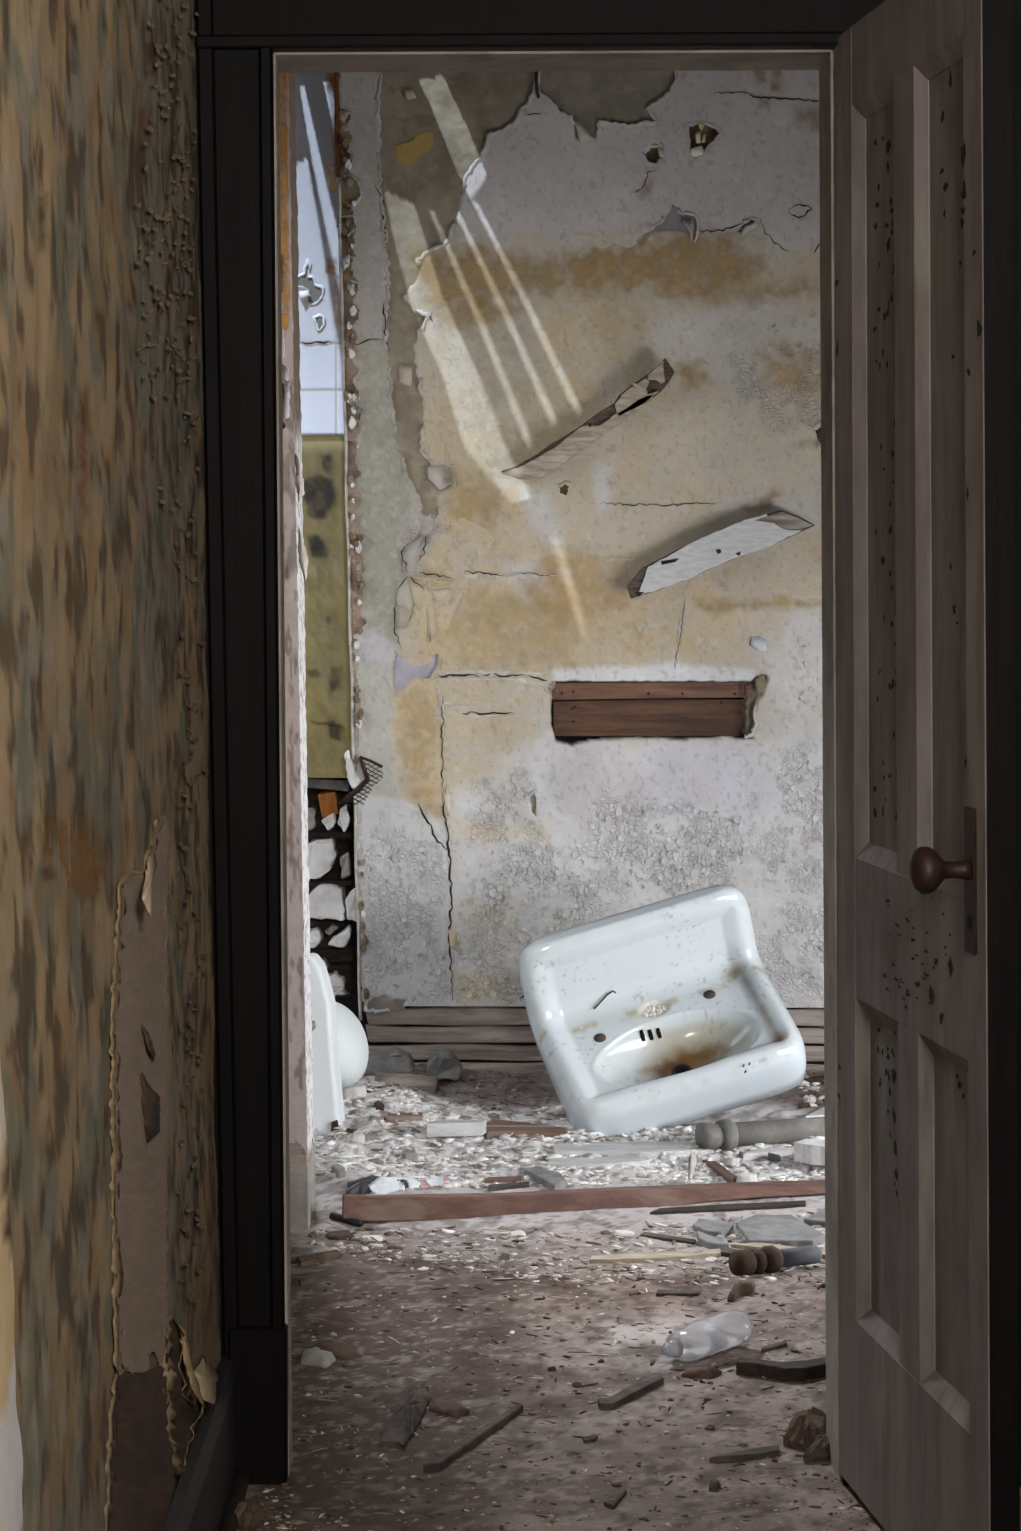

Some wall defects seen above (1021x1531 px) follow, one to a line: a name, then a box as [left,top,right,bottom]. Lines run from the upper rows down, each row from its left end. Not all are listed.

spalling [686,120,723,159]
peeling [639,204,701,245]
peeling [738,217,762,236]
damp [421,233,748,300]
spalling [812,421,821,450]
peeling [294,454,305,503]
peeling [298,71,678,1015]
crack [418,669,554,1001]